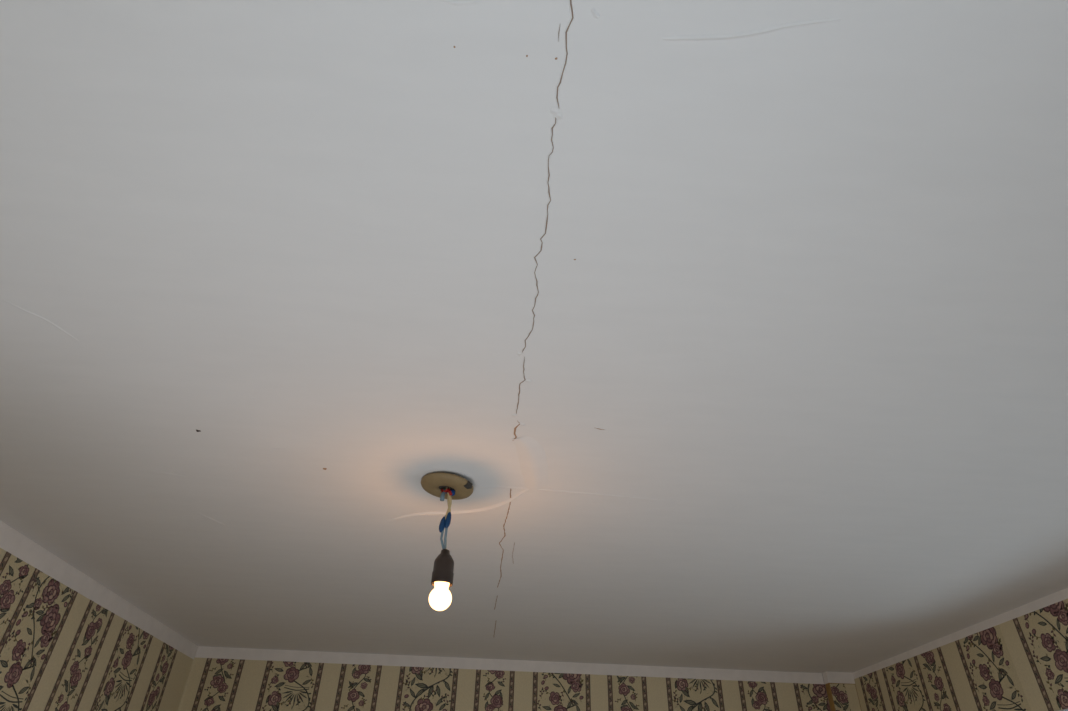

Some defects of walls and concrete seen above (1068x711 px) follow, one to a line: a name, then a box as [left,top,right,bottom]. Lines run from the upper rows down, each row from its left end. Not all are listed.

crack [511,0,575,441]
crack [493,488,515,637]